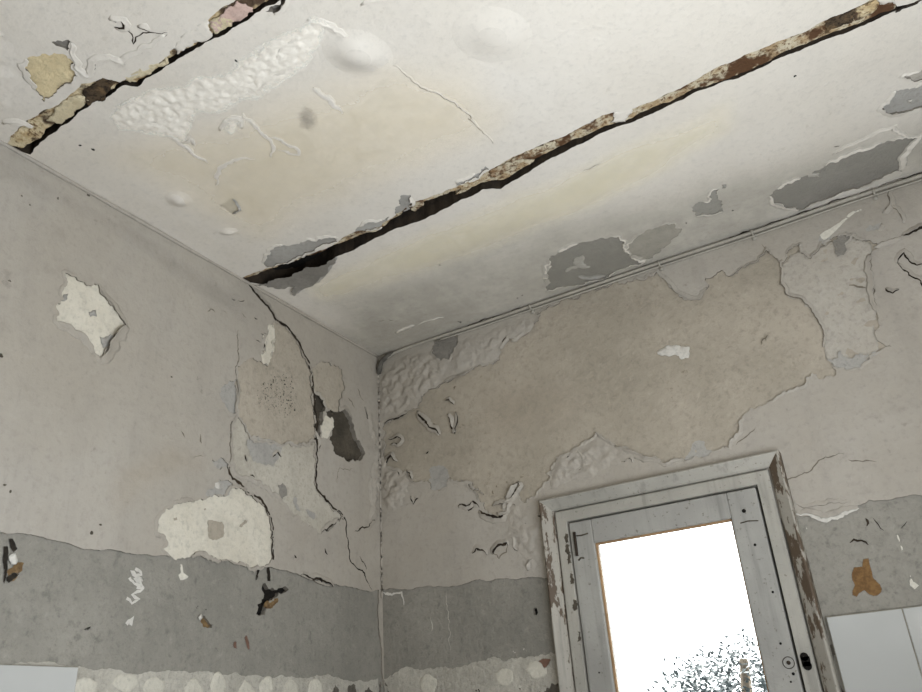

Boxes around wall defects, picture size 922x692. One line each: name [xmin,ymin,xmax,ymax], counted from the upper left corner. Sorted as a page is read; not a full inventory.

crack [69,15,167,79]
crack [393,65,494,143]
peeling [768,134,922,212]
crack [832,124,908,155]
peeling [876,70,922,118]
peeling [356,195,424,231]
peeling [53,269,129,365]
peeling [380,184,886,517]
peeling [206,320,362,553]
crack [208,285,380,586]
peeling [564,533,588,584]
rust [852,558,882,597]